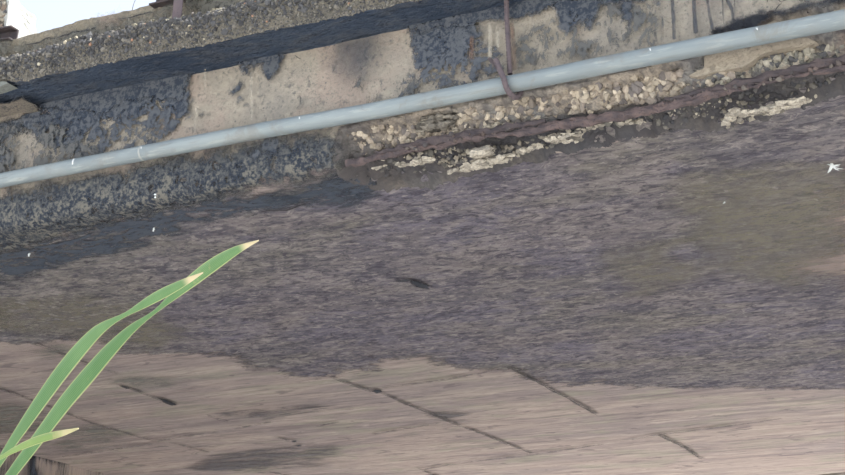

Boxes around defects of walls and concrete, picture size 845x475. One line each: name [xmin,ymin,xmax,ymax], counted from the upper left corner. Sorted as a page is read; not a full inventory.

spalling [757,1,845,26]
leakage [0,132,377,285]
spalling [0,29,845,390]
crack [332,374,589,460]
crack [507,366,596,415]
crack [632,419,776,459]